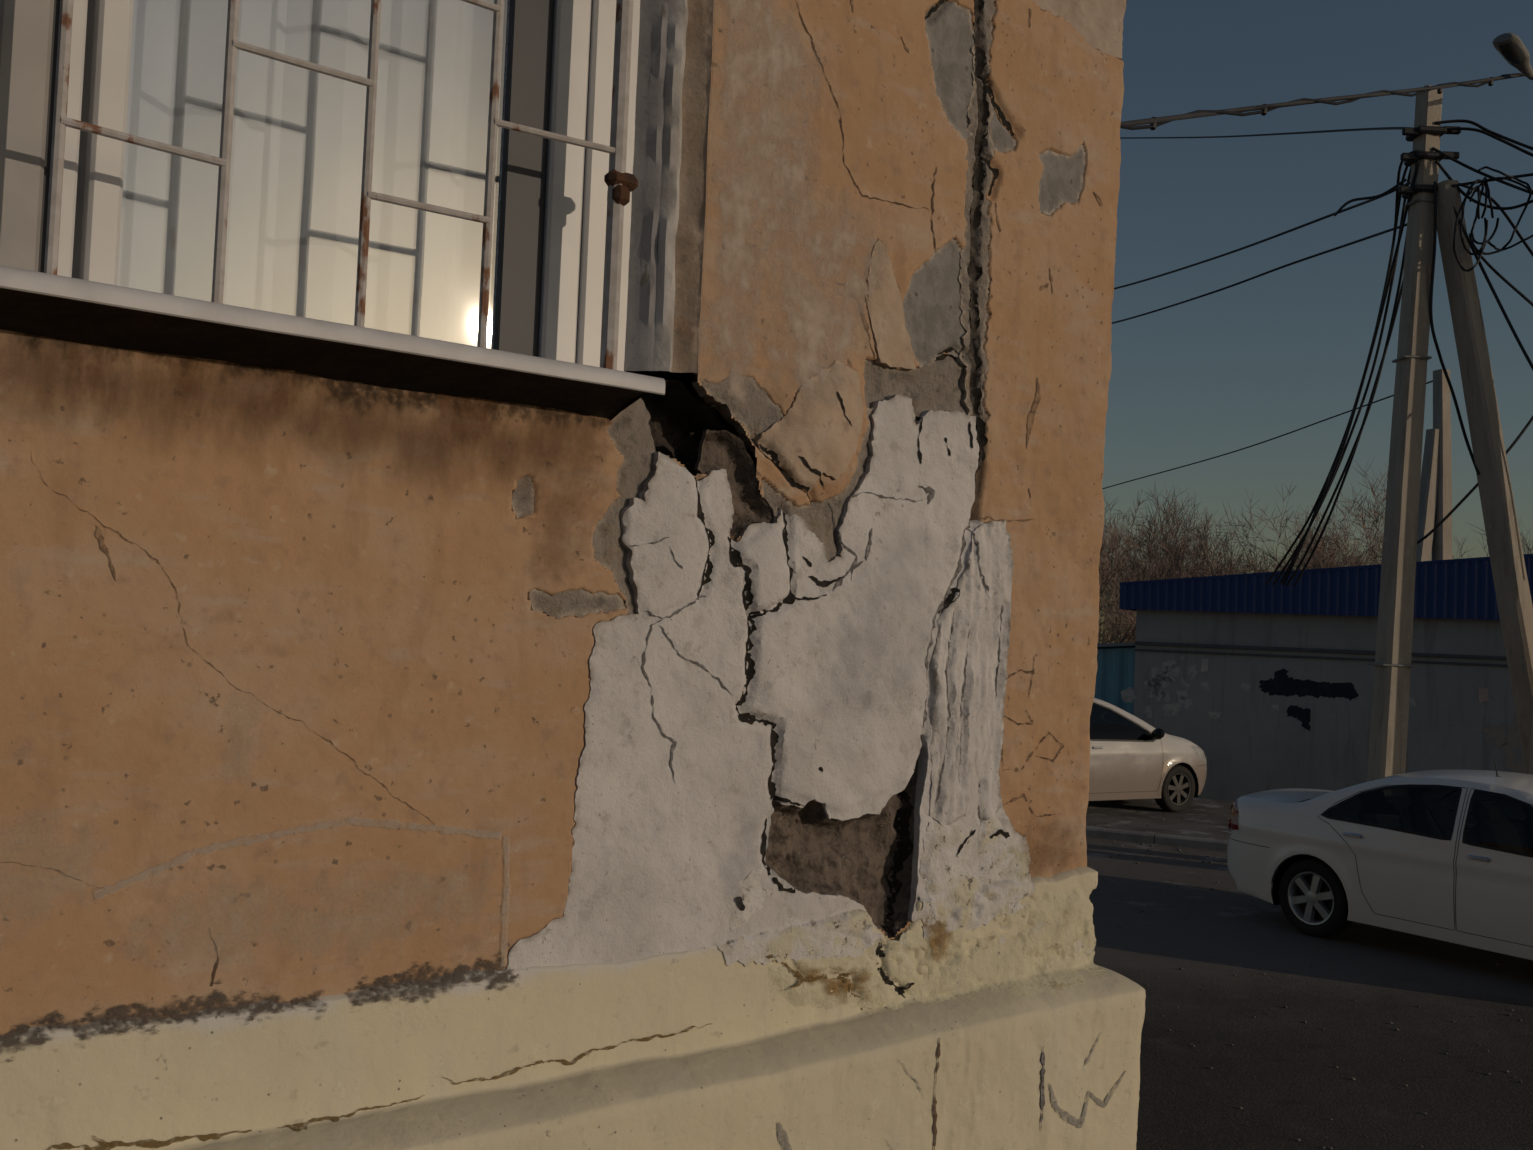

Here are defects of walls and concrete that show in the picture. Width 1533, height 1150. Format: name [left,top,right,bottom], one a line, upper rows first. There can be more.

peeling [1029,0,1126,60]
spalling [1038,145,1103,216]
spalling [527,0,1017,619]
damp [106,361,603,470]
spalling [512,476,535,519]
crack [765,0,1034,998]
crack [31,453,441,834]
crack [629,439,935,876]
spalling [717,756,1035,967]
crack [47,1023,712,1150]
crack [899,1038,941,1150]
crack [1039,1047,1047,1131]